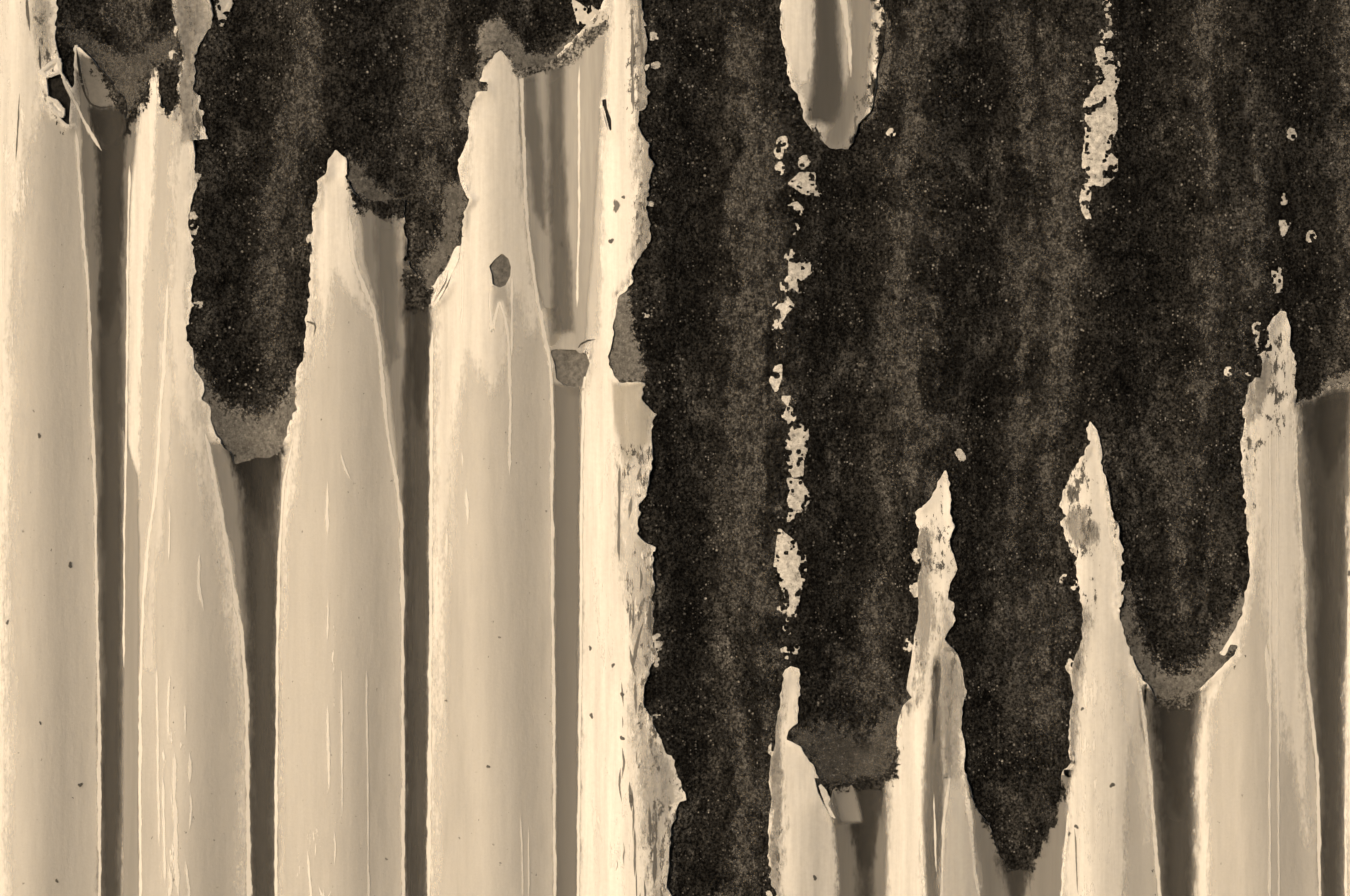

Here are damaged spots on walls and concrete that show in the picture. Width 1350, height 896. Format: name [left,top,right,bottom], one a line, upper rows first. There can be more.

peeling [34,10,71,124]
peeling [173,0,212,141]
peeling [613,0,654,256]
peeling [490,254,511,288]
rust [55,0,610,896]
peeling [550,349,590,387]
rust [608,0,1350,896]
peeling [1066,449,1098,565]
peeling [1242,332,1291,481]
peeling [611,445,672,896]
peeling [906,485,964,769]
peeling [769,715,783,891]